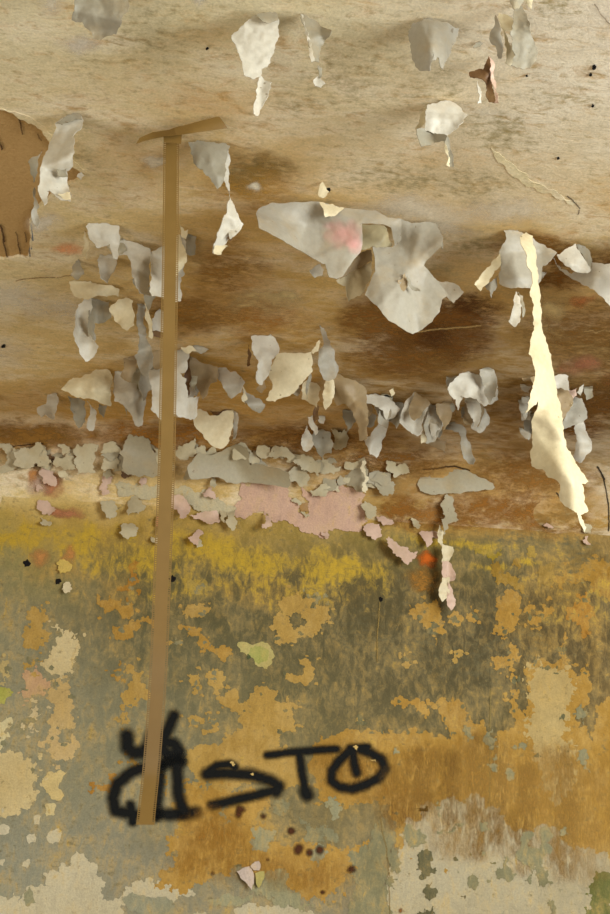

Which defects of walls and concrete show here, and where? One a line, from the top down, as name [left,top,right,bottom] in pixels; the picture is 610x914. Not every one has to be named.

peeling [231,12,279,116]
peeling [415,100,468,167]
flaking render [0,107,85,265]
peeling [188,140,243,255]
peeling [256,182,464,334]
damp [529,233,578,289]
damp [340,295,499,374]
damp [547,300,610,436]
damp [243,425,439,475]
damp [380,496,538,530]
crack [597,466,610,531]
flaking render [0,223,610,914]